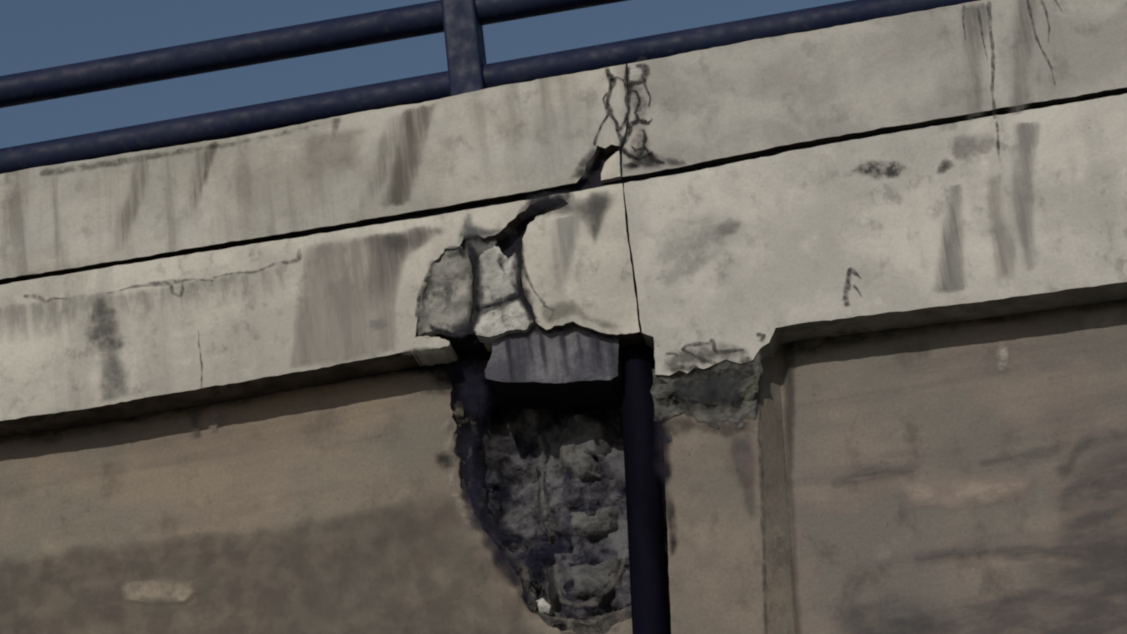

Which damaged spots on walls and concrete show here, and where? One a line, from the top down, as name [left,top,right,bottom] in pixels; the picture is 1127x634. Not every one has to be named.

damp [391,106,428,205]
crack [588,57,665,184]
damp [940,138,982,171]
crack [962,2,1000,149]
damp [1017,123,1034,244]
crack [1027,0,1056,84]
damp [91,300,121,348]
damp [293,228,431,365]
spalling [412,192,632,634]
damp [666,347,743,369]
damp [939,209,963,291]
spalling [661,476,671,634]